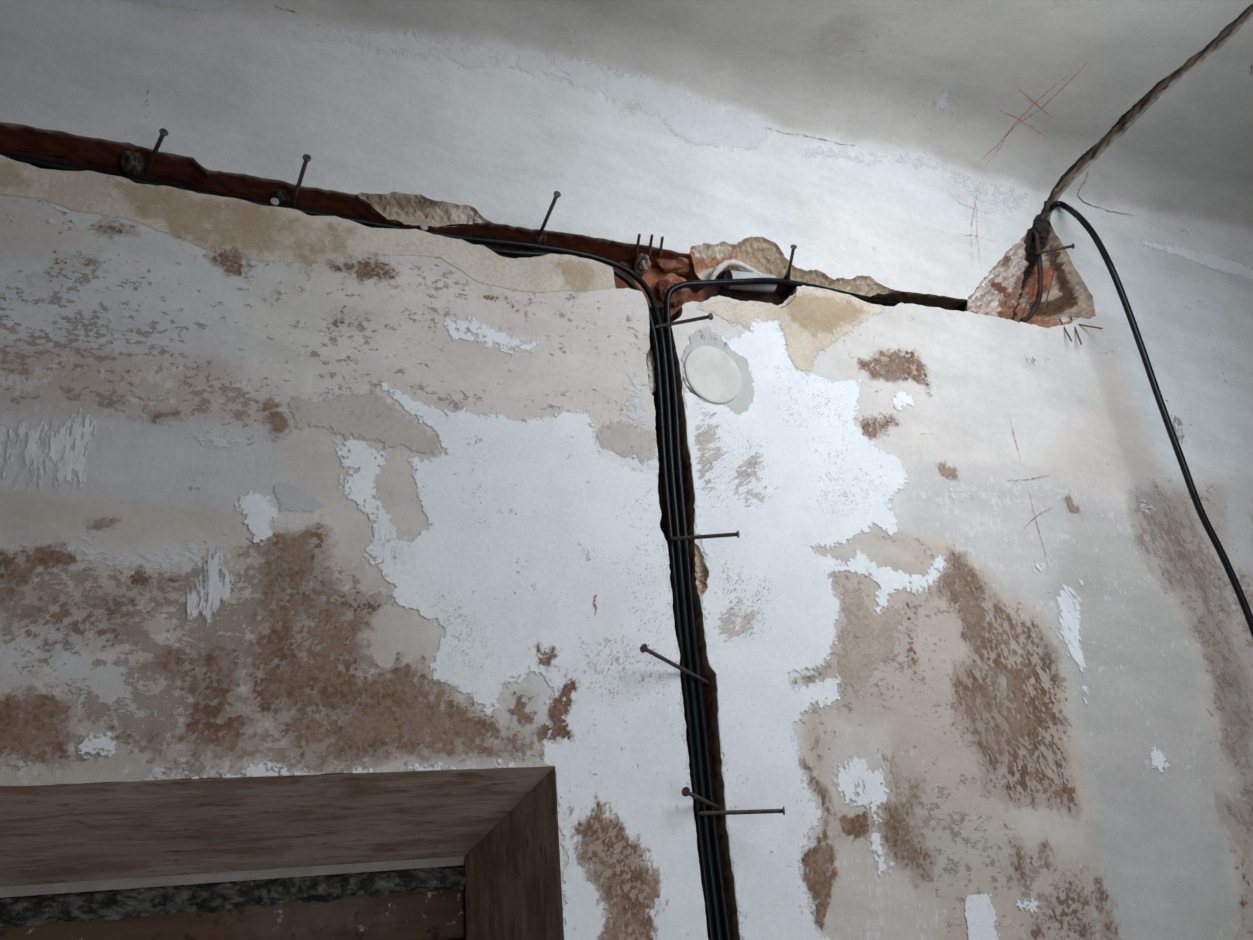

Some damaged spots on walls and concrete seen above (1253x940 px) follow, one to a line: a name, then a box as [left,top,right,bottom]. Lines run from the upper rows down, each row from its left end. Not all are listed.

peeling [210,247,254,278]
peeling [329,257,399,284]
spalling [358,192,489,228]
spalling [689,236,896,297]
spalling [965,219,1096,328]
spalling [646,349,654,396]
peeling [857,350,931,395]
peeling [0,542,180,764]
peeling [108,523,578,769]
peeling [792,550,1082,822]
peeling [570,796,665,940]
peeling [799,748,934,930]